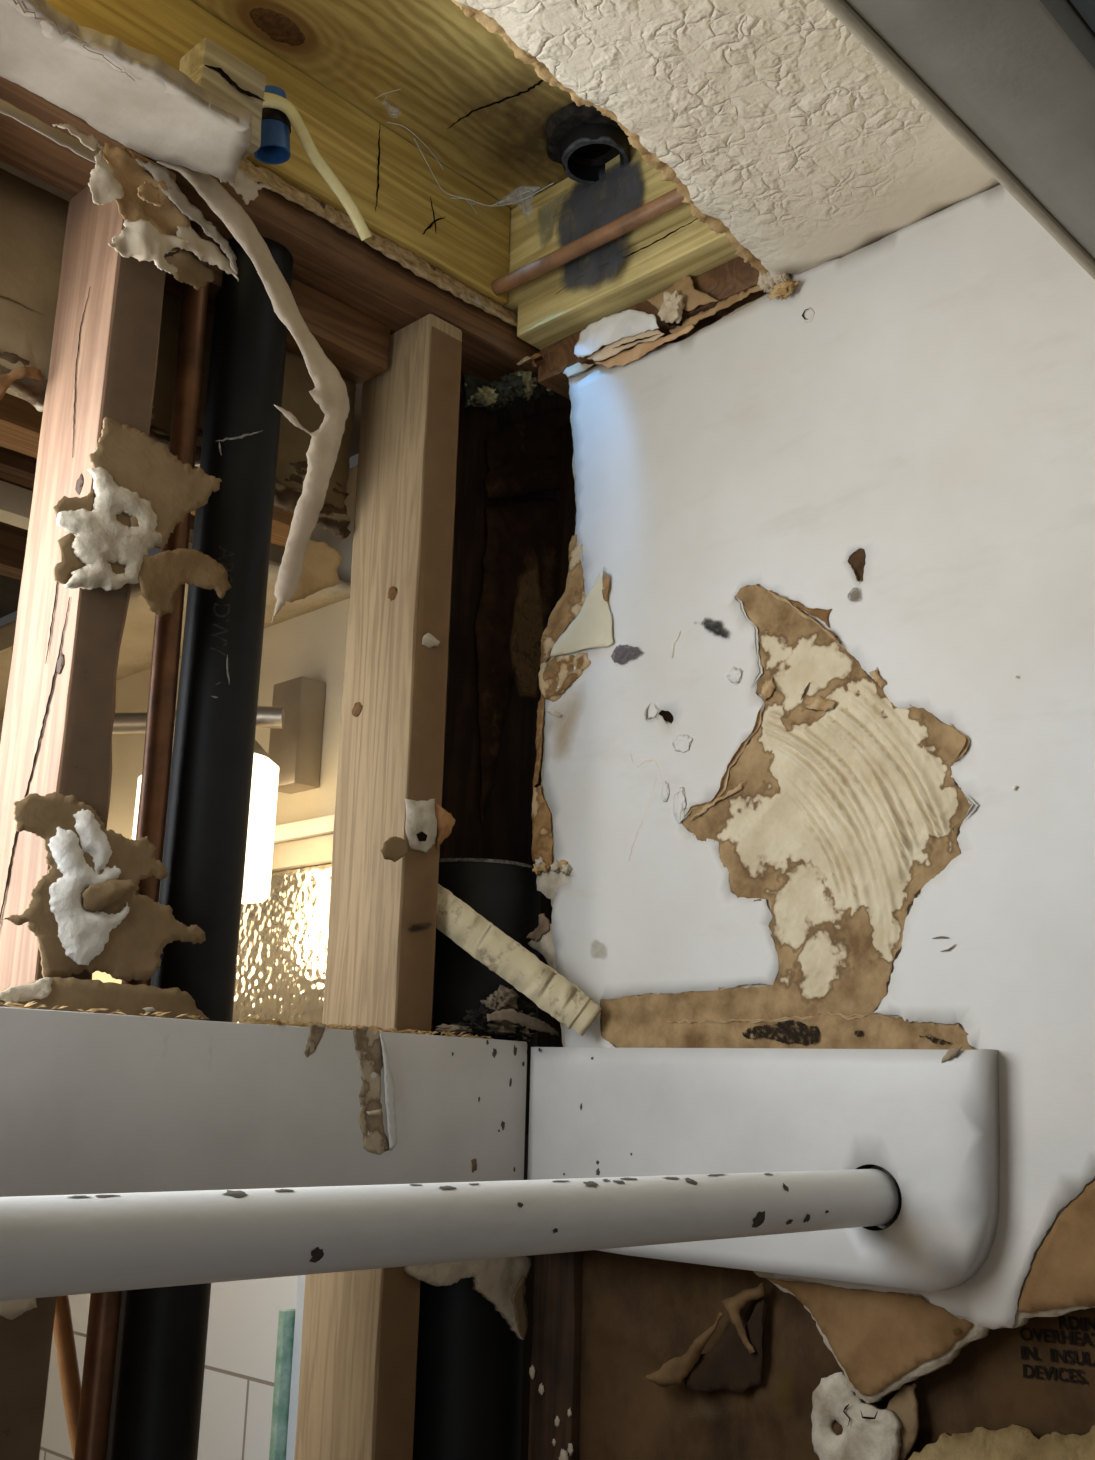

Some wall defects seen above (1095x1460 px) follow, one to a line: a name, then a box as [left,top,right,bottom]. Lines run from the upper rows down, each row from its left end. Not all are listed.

crack [447,80,544,129]
leakage [538,163,643,289]
peeling [531,534,614,876]
peeling [600,584,978,1063]
peeling [353,1026,397,1155]
peeling [309,1247,324,1263]
peeling [410,1158,479,1190]
peeling [553,1160,637,1188]
peeling [663,1174,725,1185]
peeling [752,1211,765,1228]
peeling [1017,1180,1095,1313]
peeling [763,1277,973,1396]